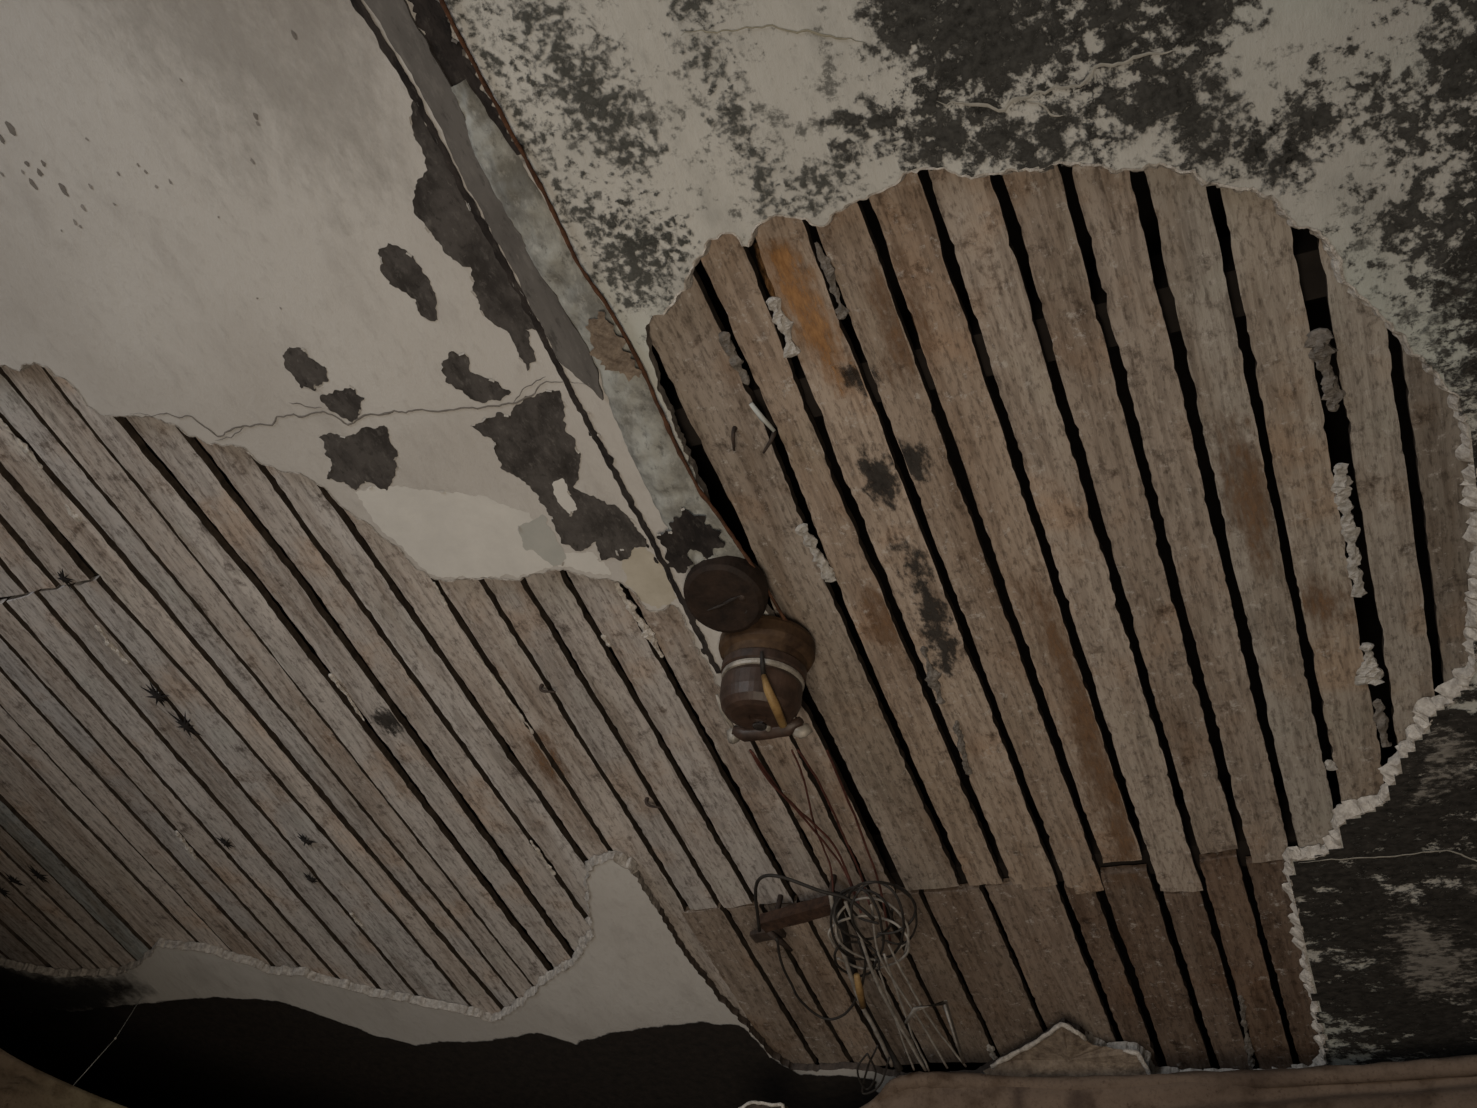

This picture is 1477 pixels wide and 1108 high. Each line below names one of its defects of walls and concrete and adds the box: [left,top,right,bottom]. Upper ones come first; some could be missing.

flaking render [0,160,93,232]
peeling [283,347,364,423]
peeling [378,243,438,321]
crack [136,0,740,674]
peeling [440,351,511,403]
flaking render [0,362,998,1066]
mould [446,0,700,313]
leakage [857,440,931,510]
leakage [890,541,960,678]
flaking render [649,161,1477,1074]
leakage [663,0,1477,489]
leakage [1289,684,1477,1065]